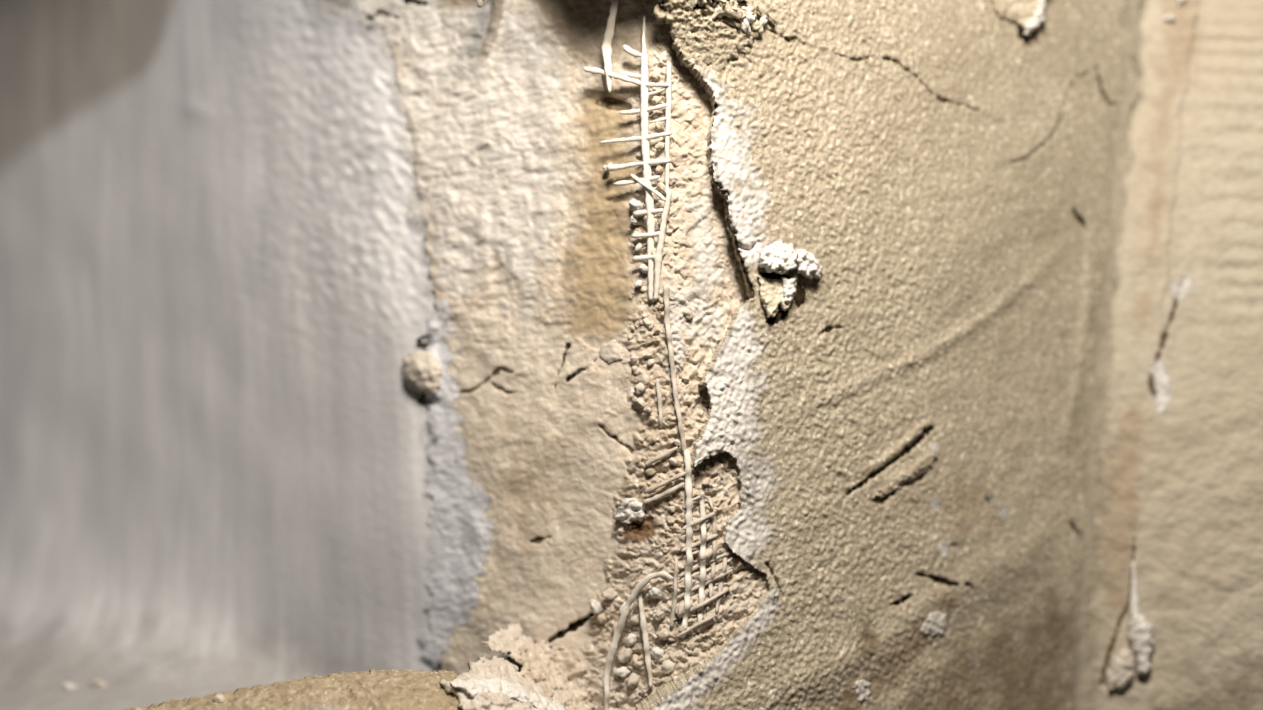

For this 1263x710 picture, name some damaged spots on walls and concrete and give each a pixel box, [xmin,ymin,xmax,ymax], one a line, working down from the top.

crack [771,30,798,43]
crack [833,51,981,111]
crack [1009,66,1100,164]
flaking render [580,16,823,710]
crack [1148,277,1183,402]
peeling [417,298,494,666]
crack [870,471,928,504]
crack [890,573,974,606]
crack [1099,537,1135,685]